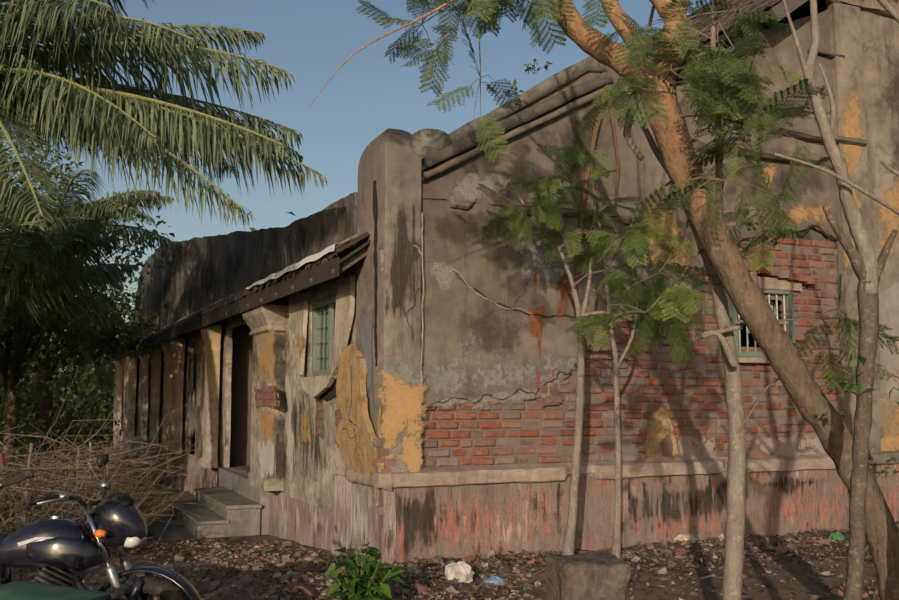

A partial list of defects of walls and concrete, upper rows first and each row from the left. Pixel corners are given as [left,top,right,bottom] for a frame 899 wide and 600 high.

peeling [840,88,862,209]
peeling [254,328,280,445]
crack [371,179,379,366]
leakage [385,208,421,316]
crack [399,213,424,385]
leakage [362,311,577,407]
crack [450,266,576,345]
flaking render [372,265,728,473]
flaking render [738,333,818,456]
flaking render [737,204,856,421]
leakage [397,489,441,557]
leakage [625,479,727,523]